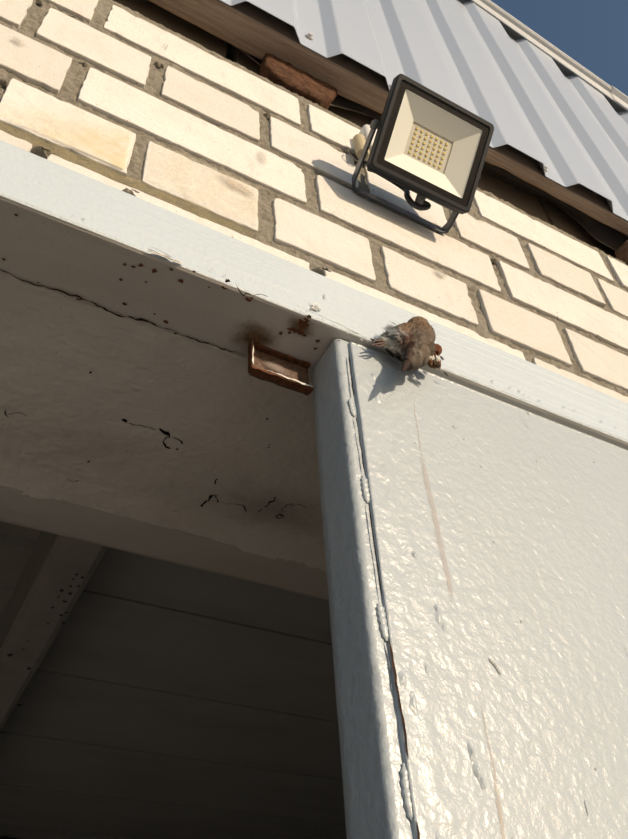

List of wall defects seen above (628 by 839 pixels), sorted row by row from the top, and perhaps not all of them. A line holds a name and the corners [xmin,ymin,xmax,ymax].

crack [221,279,268,302]
crack [0,269,245,359]
rust [279,315,320,350]
crack [121,419,183,450]
crack [200,479,308,519]